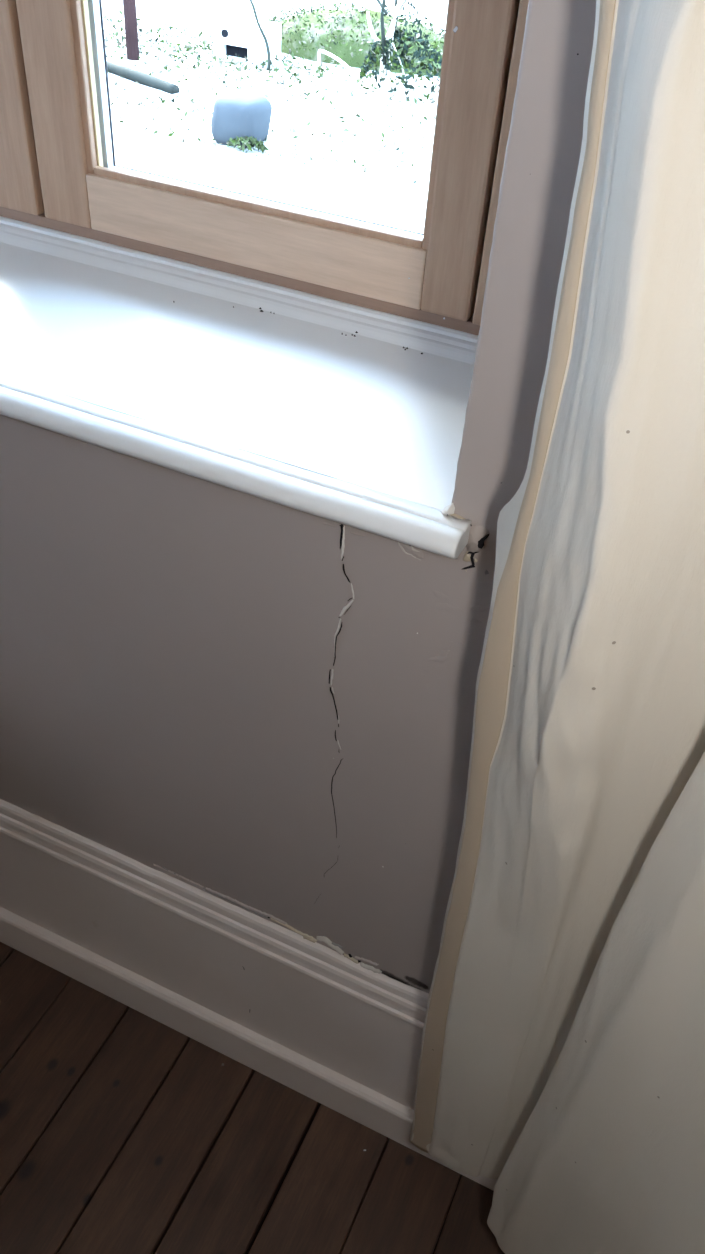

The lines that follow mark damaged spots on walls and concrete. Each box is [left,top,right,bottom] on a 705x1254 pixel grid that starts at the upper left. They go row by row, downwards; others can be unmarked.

crack [314,524,354,904]